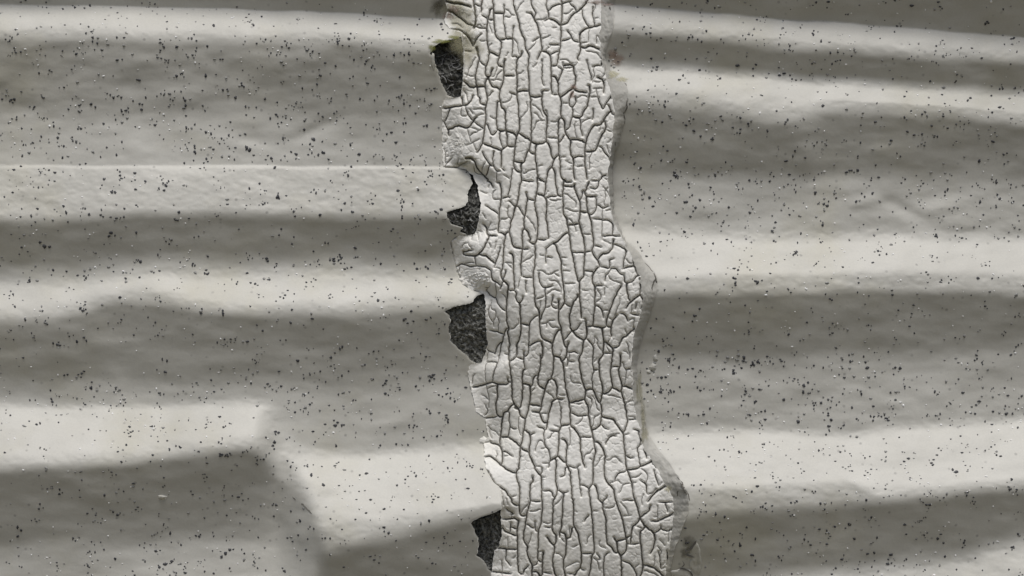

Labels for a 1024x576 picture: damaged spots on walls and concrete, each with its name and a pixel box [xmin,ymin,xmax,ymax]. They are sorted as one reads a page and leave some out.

crack [444,0,672,576]